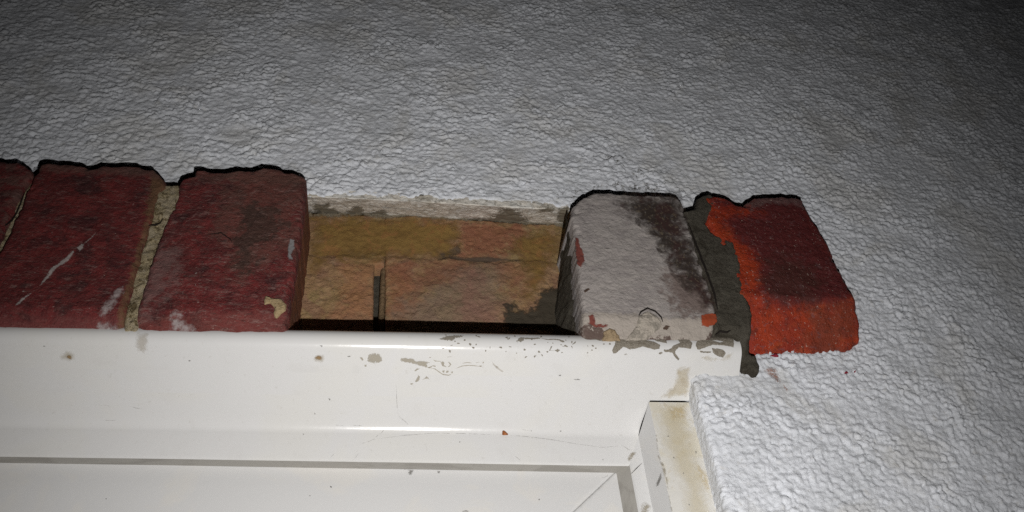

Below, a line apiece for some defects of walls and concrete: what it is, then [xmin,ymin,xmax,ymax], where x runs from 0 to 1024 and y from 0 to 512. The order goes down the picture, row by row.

water stain [309,194,734,396]